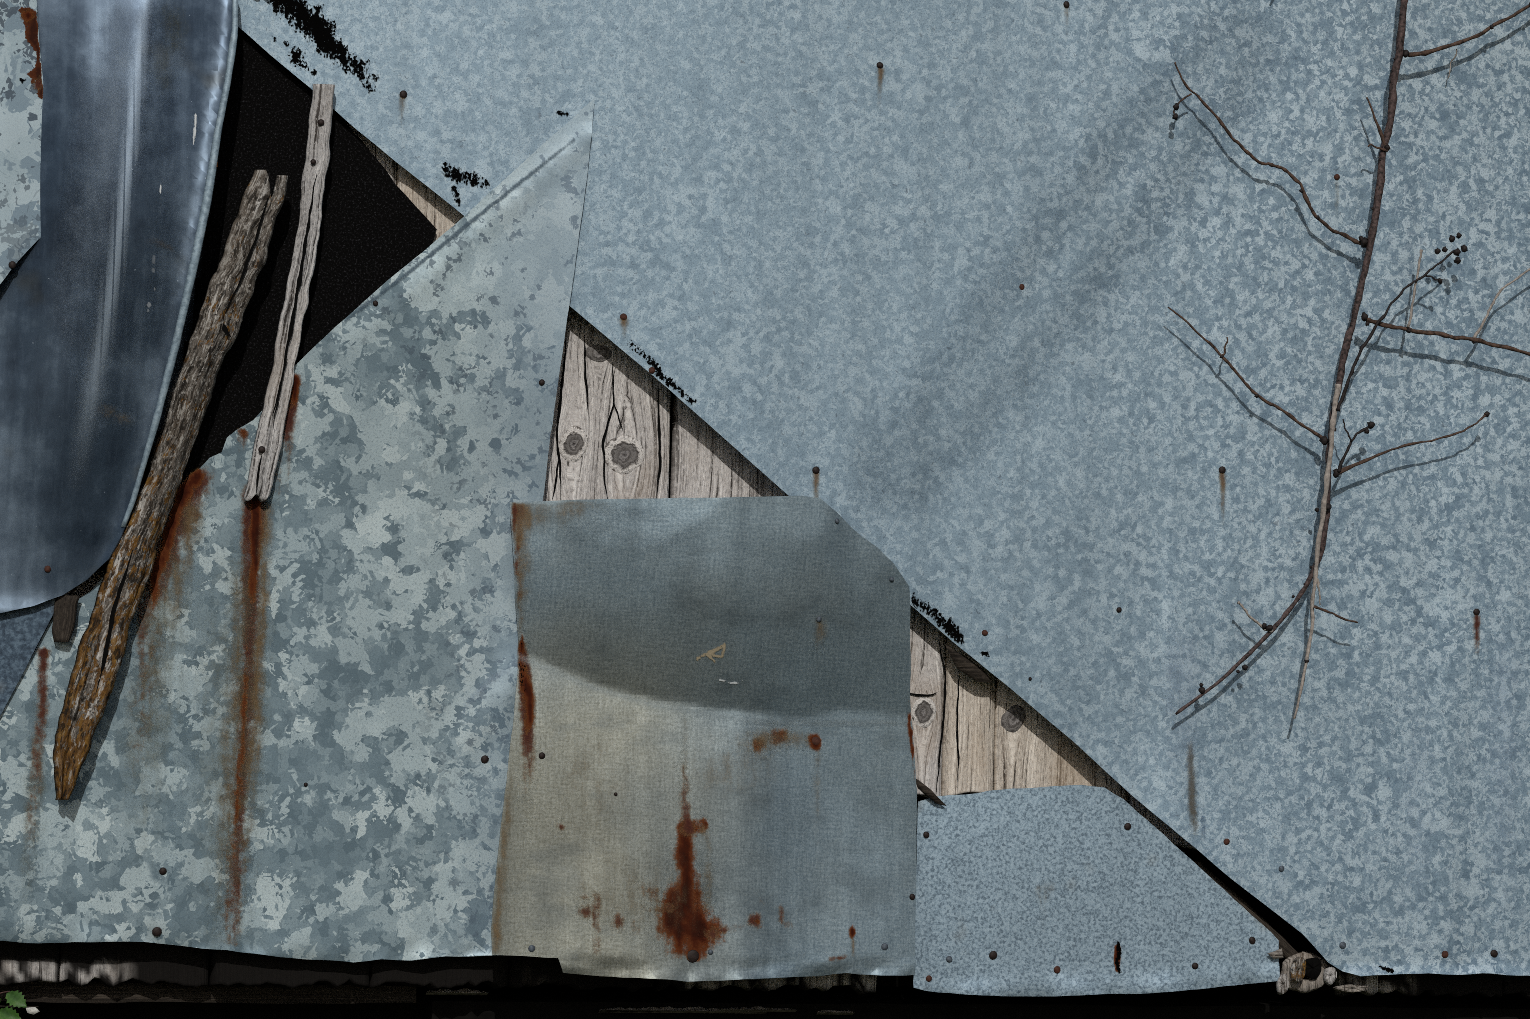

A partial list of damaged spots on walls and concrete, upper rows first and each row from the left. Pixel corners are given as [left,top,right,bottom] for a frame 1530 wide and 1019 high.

rust [18,7,43,99]
rust [137,469,211,714]
rust [32,647,49,775]
rust [225,486,268,939]
rust [518,636,535,771]
rust [753,730,821,752]
rust [648,788,727,961]
rust [1114,941,1122,973]